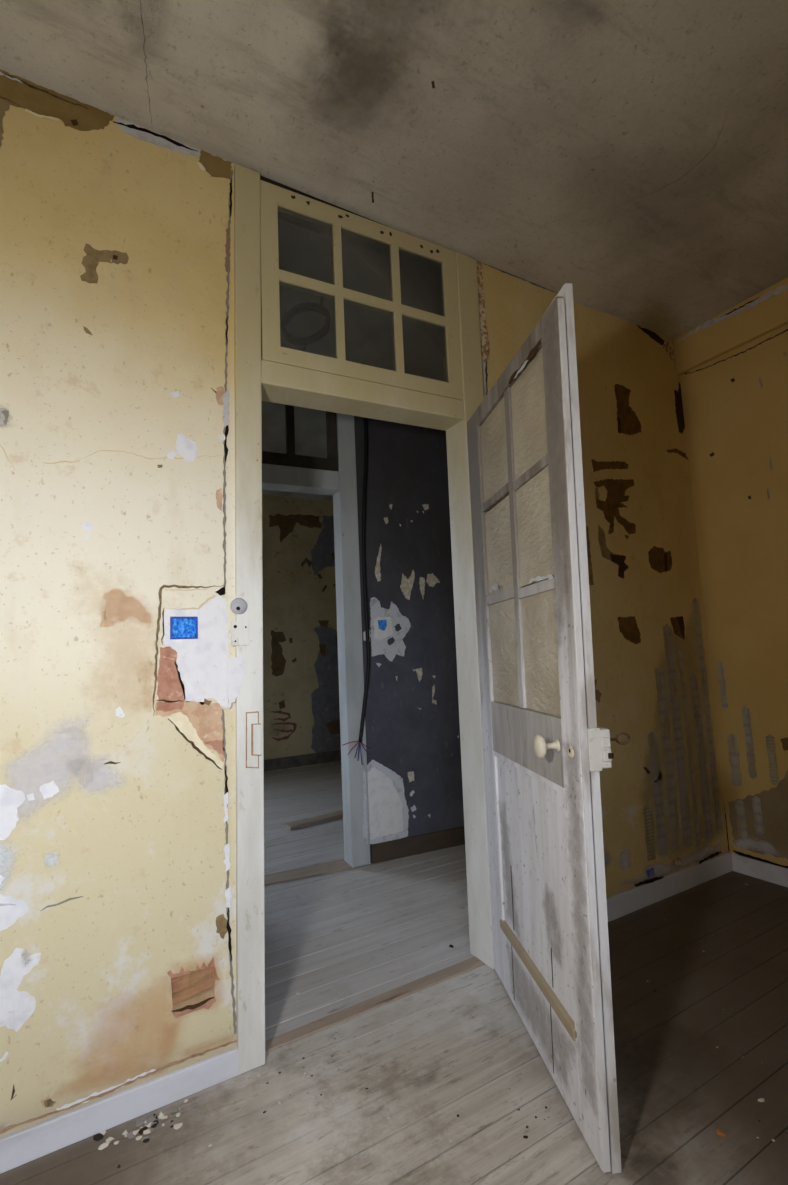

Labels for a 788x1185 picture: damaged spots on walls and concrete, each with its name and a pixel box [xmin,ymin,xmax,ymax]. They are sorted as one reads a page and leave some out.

peeling [0,70,114,147]
peeling [80,243,129,284]
peeling [614,384,641,435]
crack [42,170,233,716]
peeling [586,459,636,585]
peeling [648,546,672,573]
peeling [618,616,641,644]
peeling [670,616,685,640]
peeling [155,609,225,770]
peeling [728,770,788,859]
spalling [167,957,220,1018]